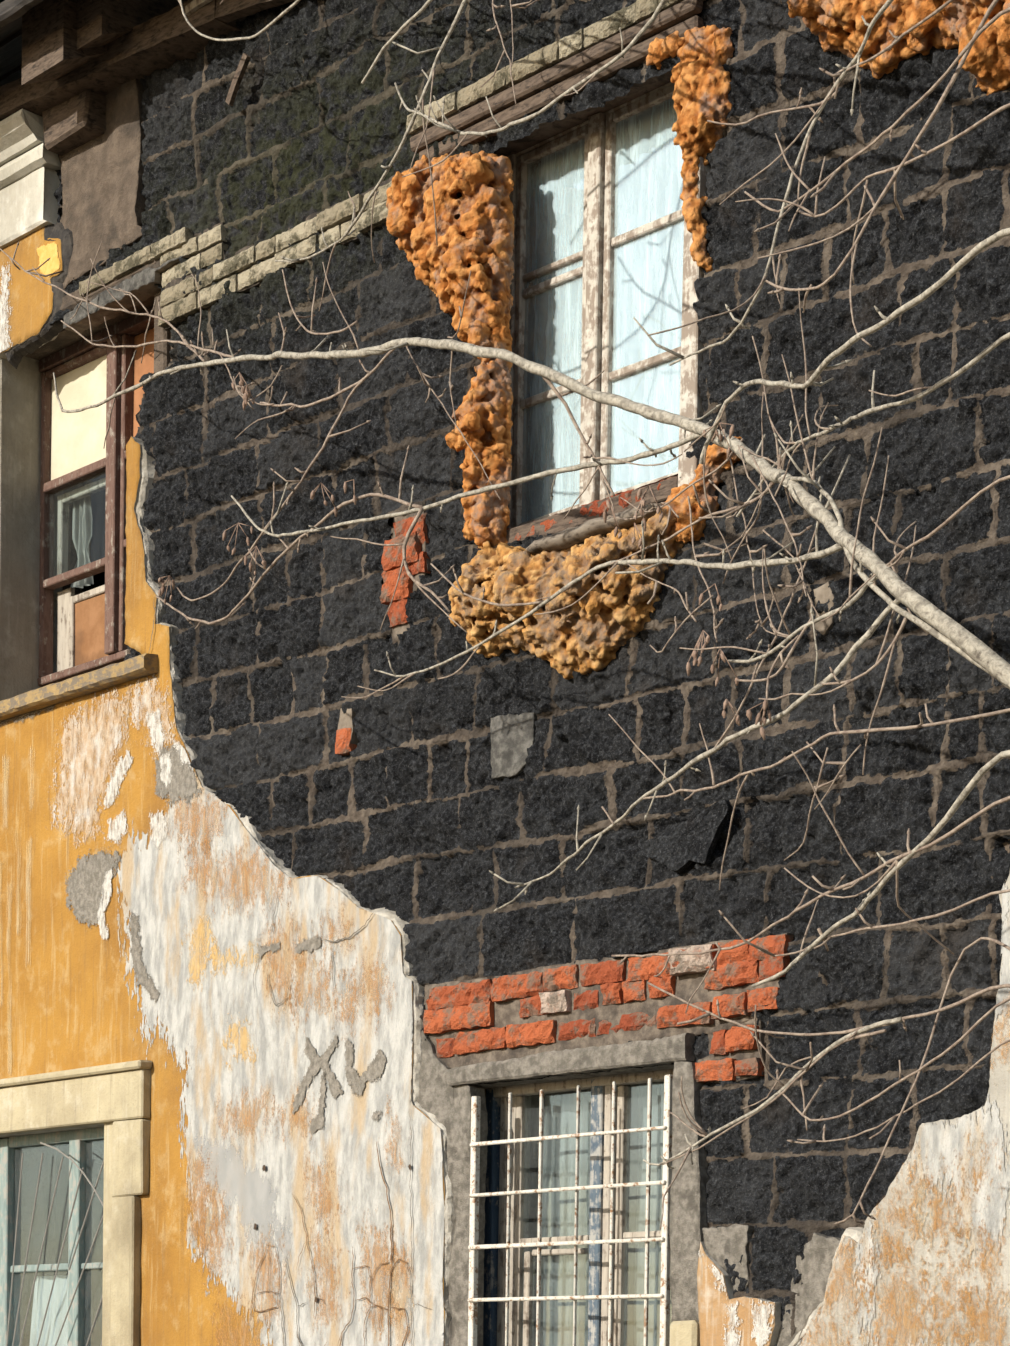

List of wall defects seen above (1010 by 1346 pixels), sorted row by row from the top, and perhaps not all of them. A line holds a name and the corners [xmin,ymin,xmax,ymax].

spalling [4,0,680,369]
spalling [686,0,1010,664]
spalling [48,223,1010,1346]